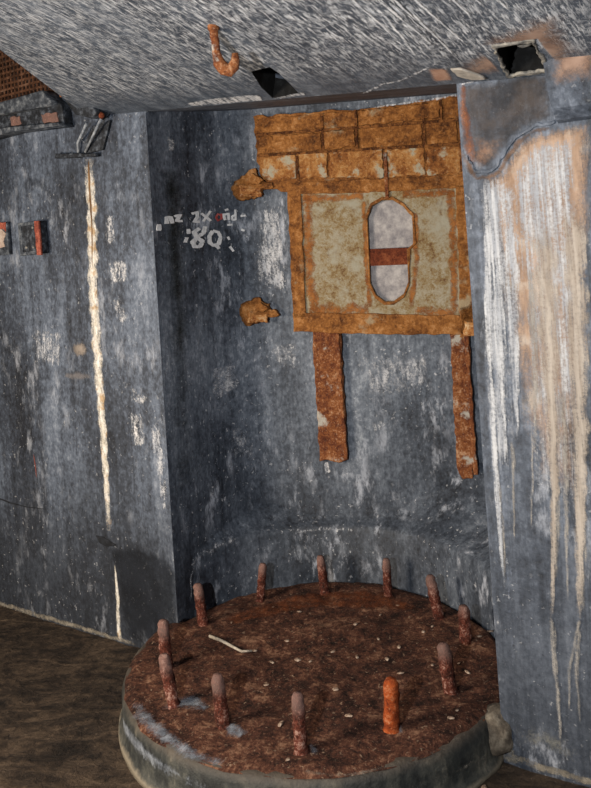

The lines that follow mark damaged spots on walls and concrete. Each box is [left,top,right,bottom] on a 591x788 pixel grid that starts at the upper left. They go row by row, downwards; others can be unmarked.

leakage [85,161,110,517]
leakage [483,141,590,605]
corrosion [124,582,500,779]
leakage [534,763,591,785]
leakage [551,622,579,730]